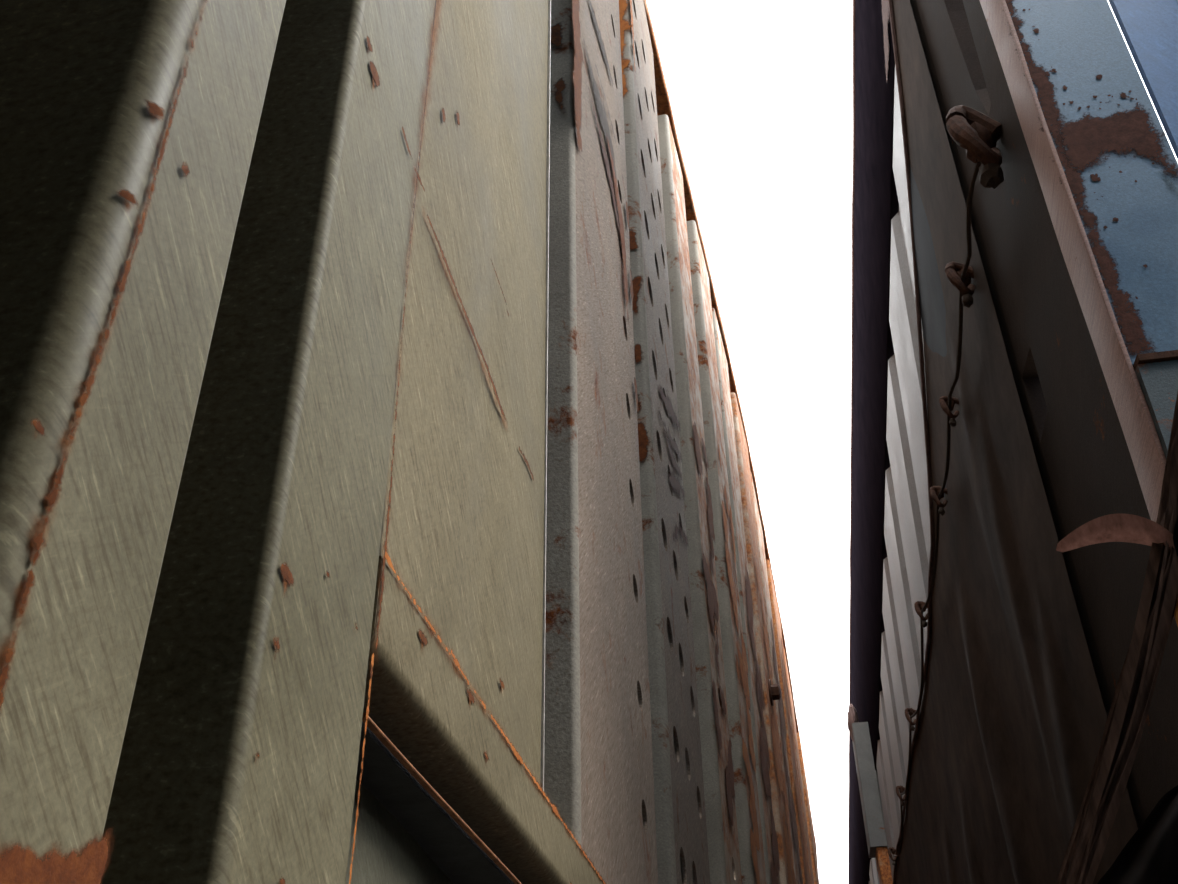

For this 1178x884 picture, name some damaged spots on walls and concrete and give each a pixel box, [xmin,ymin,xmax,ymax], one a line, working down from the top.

rust [366,36,380,88]
rust [551,0,583,151]
rust [1003,0,1178,355]
rust [0,62,188,708]
rust [634,344,643,363]
rust [634,378,651,462]
rust [349,434,606,884]
rust [0,833,110,884]